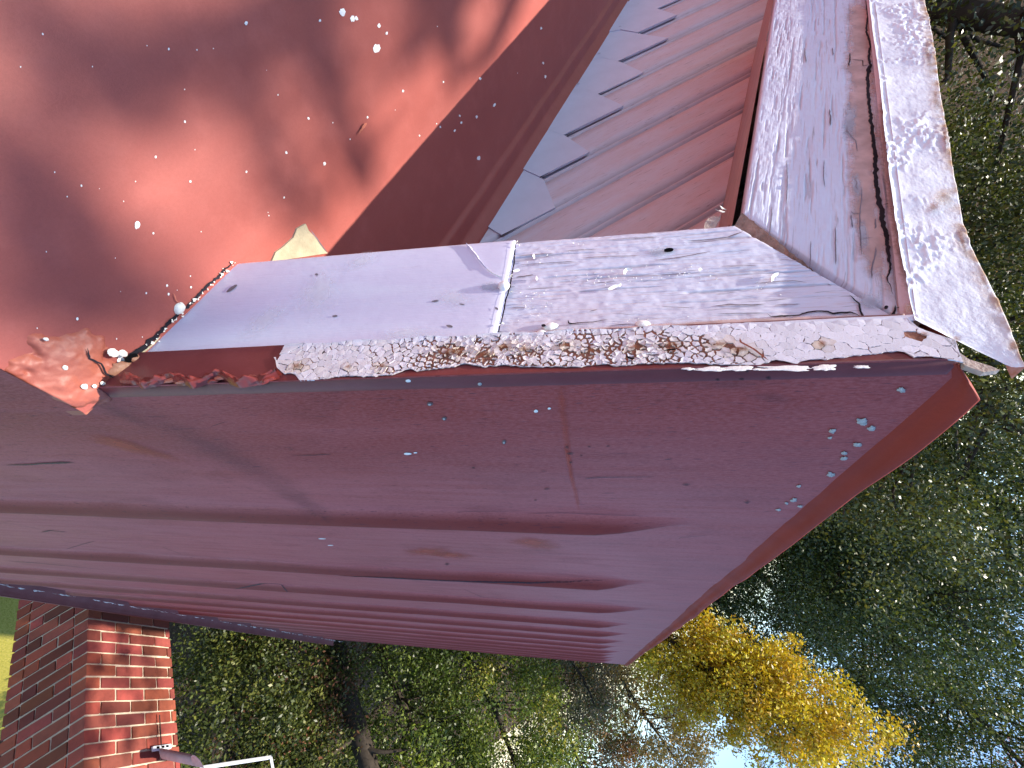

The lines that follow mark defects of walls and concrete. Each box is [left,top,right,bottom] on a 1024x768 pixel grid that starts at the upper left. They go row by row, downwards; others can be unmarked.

crack [716,0,899,317]
peeling [274,276,967,386]
peeling [570,263,718,290]